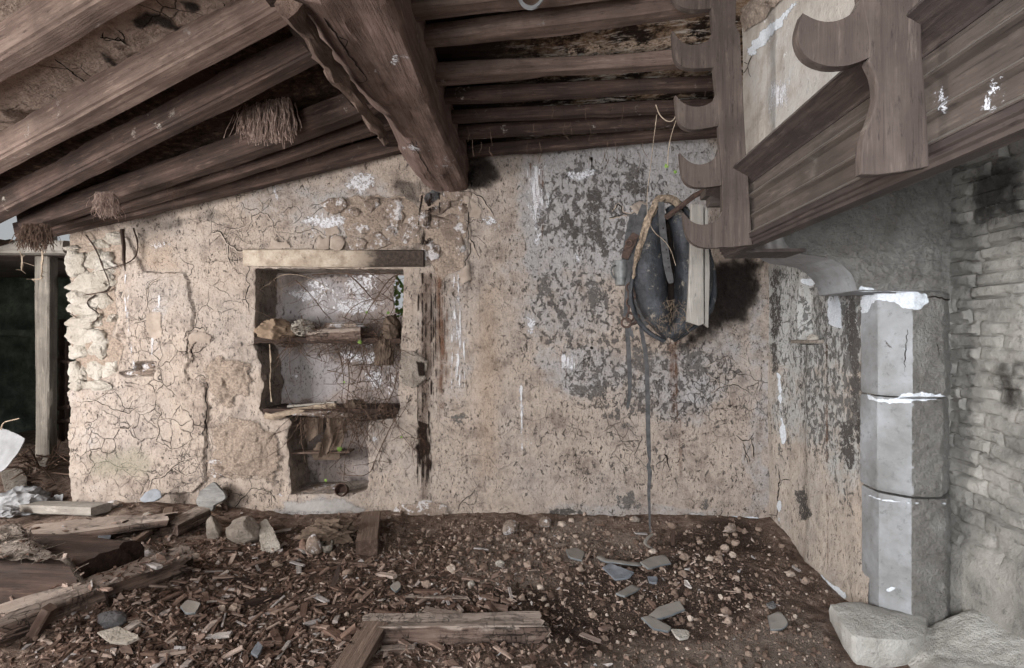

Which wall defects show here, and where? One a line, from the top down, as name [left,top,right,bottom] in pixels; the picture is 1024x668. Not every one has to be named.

flaking render [619,163,647,214]
crack [207,198,291,315]
flaking render [559,189,610,257]
flaking render [769,266,783,375]
crack [75,256,210,489]
damp [415,269,465,485]
flaking render [570,380,605,400]
flaking render [839,297,861,470]
crack [615,428,670,470]
crack [736,433,754,463]
crack [234,479,278,508]
flaking render [794,482,812,520]